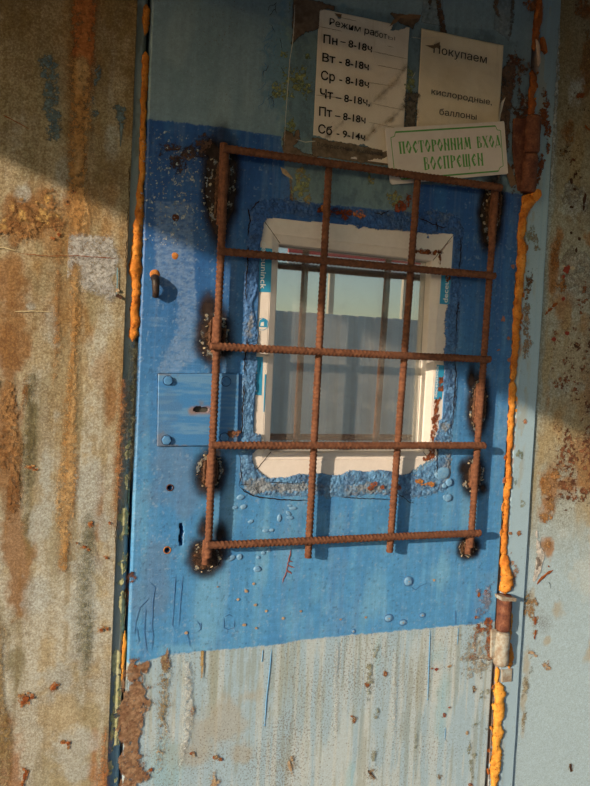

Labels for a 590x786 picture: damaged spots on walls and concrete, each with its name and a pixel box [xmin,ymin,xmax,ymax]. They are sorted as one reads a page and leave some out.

corrosion [536,87,552,186]
corrosion [0,0,99,572]
corrosion [544,236,567,315]
corrosion [423,376,444,461]
corrosion [539,469,562,524]
corrosion [431,582,494,693]
corrosion [18,692,34,708]
corrosion [95,648,172,786]